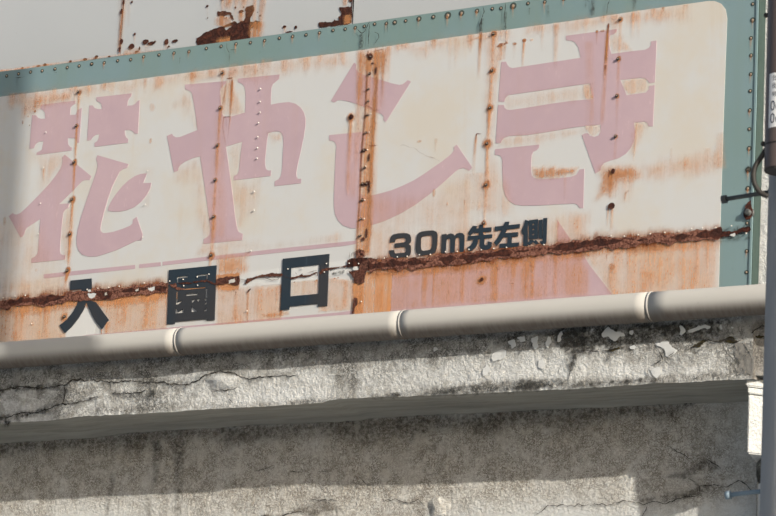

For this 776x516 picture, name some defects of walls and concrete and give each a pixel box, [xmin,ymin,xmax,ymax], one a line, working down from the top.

corrosion [83,0,178,65]
corrosion [196,0,263,48]
corrosion [318,0,353,27]
corrosion [0,267,168,337]
peeling [482,331,563,376]
peeling [591,327,634,341]
water stain [540,320,720,365]
peeling [656,340,677,357]
crack [0,370,295,418]
water stain [491,376,657,392]
water stain [219,403,692,441]
crack [538,459,751,516]